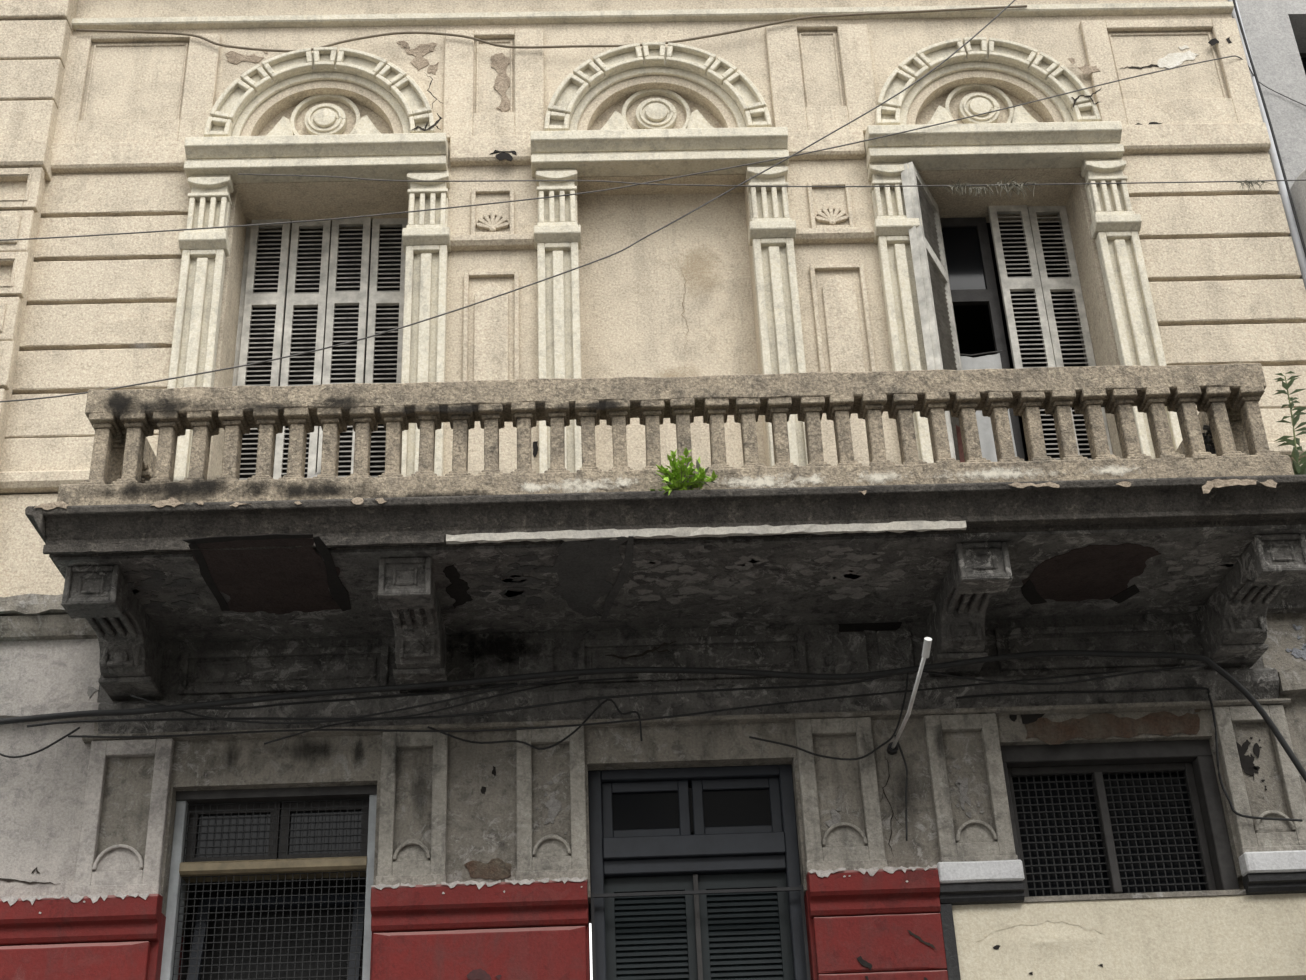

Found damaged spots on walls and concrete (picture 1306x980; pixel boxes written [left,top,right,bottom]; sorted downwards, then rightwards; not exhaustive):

peeling [397,40,439,75]
peeling [491,53,510,112]
leakage [107,392,212,415]
leakage [239,402,293,410]
leakage [317,396,363,408]
leakage [395,404,501,413]
leakage [558,400,621,409]
spalling [1202,479,1277,494]
spalling [1021,543,1238,605]
crack [0,867,61,884]
peeling [371,858,587,894]
peeling [1,892,150,914]